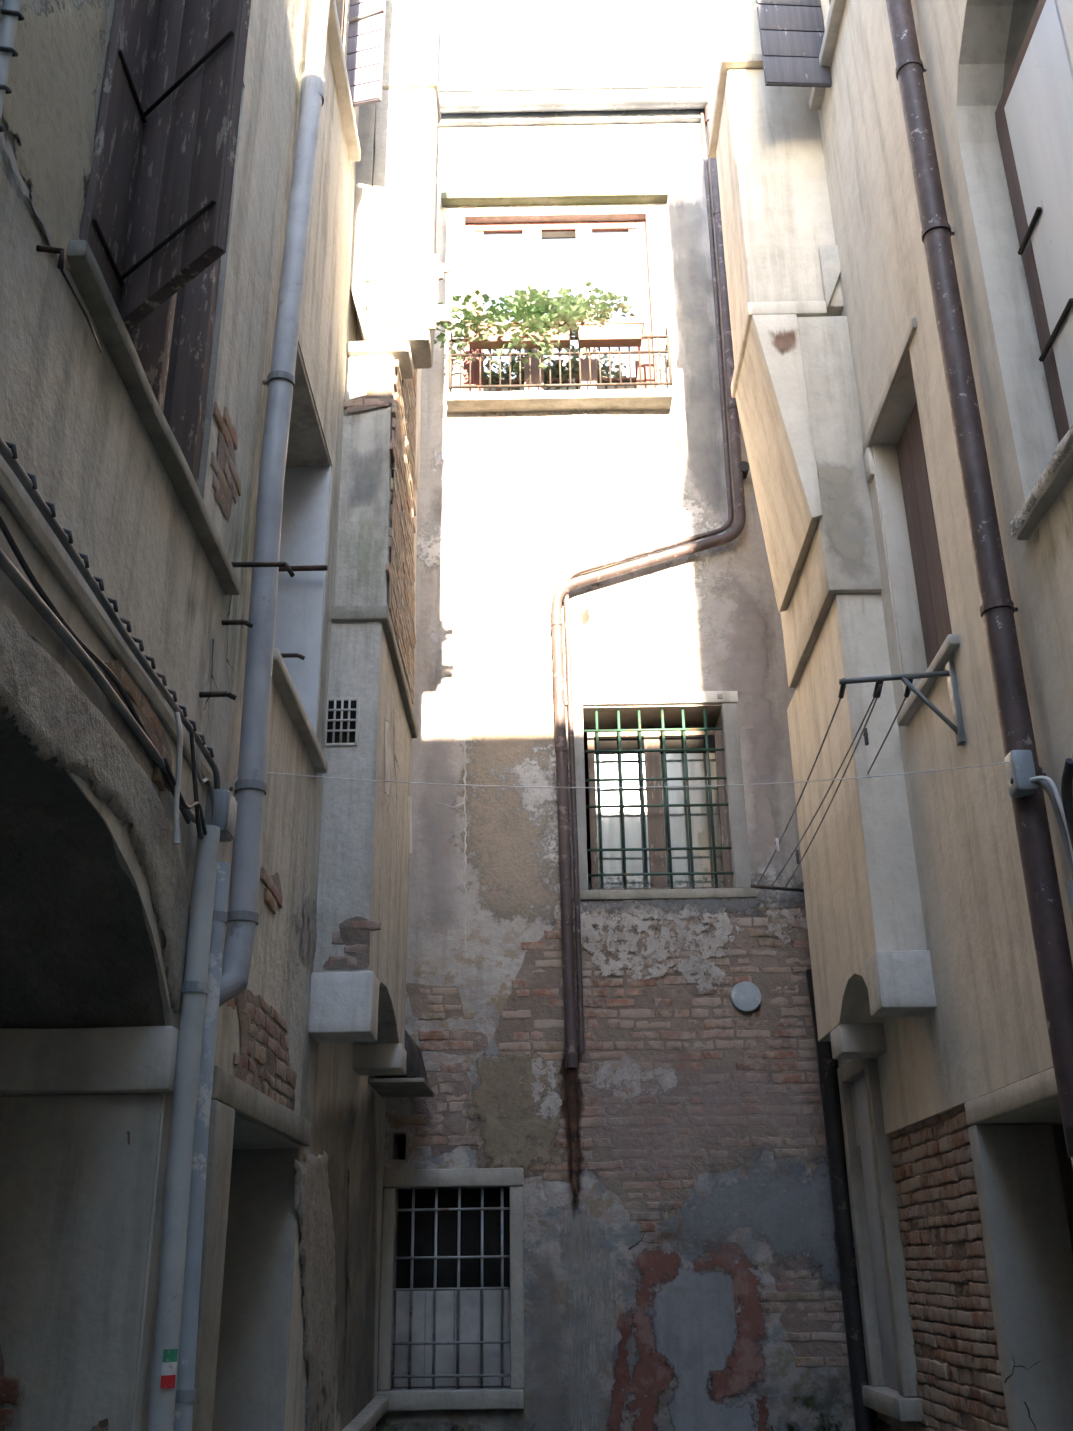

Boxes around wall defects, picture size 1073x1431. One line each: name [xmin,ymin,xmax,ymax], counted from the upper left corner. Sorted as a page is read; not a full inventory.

flaking render [358,246,452,330]
flaking render [210,401,241,520]
flaking render [260,867,381,969]
peeling [344,360,849,1431]
flaking render [227,990,297,1112]
rust [560,1047,583,1209]
damp [314,1096,376,1428]
crack [1004,1354,1040,1431]